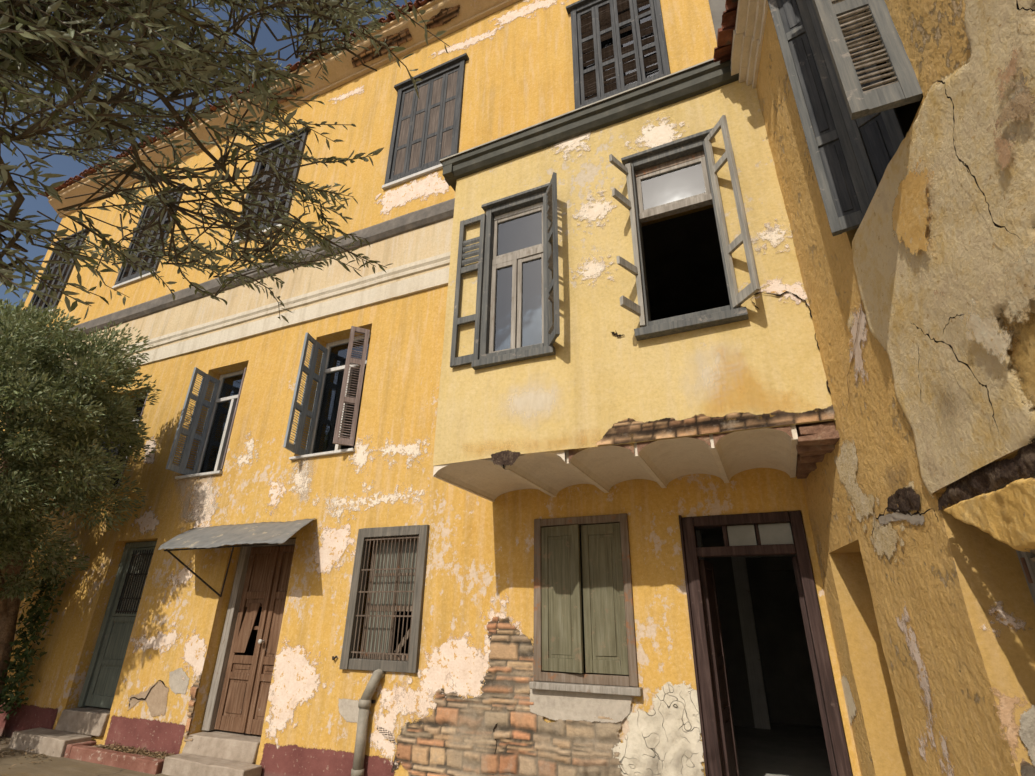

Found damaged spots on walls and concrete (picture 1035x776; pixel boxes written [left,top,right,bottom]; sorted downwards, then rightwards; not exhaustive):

peeling [426,0,568,58]
peeling [374,172,449,215]
crack [934,80,1023,241]
crack [750,291,820,350]
crack [826,300,862,409]
crack [911,314,999,432]
peeling [268,435,430,574]
flaking render [596,405,920,563]
flaking render [938,438,1035,511]
peeling [127,622,207,742]
peeling [265,639,326,749]
flaking render [369,594,704,776]